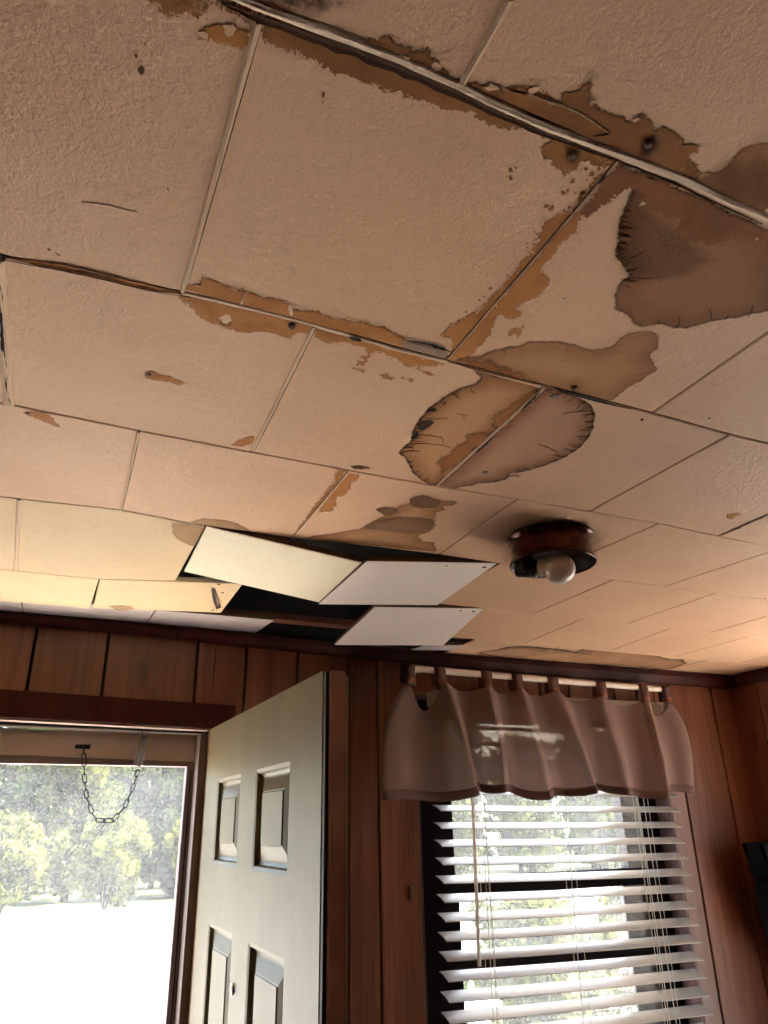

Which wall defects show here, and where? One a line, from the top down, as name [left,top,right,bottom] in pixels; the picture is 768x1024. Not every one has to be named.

peeling [149,0,768,382]
water stain [691,143,768,210]
peeling [145,372,184,385]
water stain [306,190,768,551]
peeling [293,465,370,536]